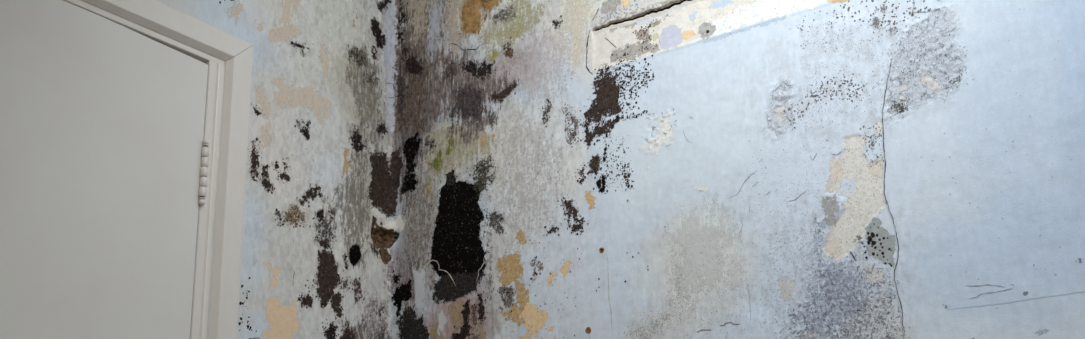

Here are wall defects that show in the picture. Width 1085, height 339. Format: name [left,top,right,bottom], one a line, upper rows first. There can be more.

crack [584,0,704,74]
flaking render [588,0,849,72]
water stain [248,0,654,339]
water stain [618,0,963,339]
peeling [821,121,896,267]
crack [881,59,905,339]
peeling [262,263,300,339]
peeling [546,261,571,286]